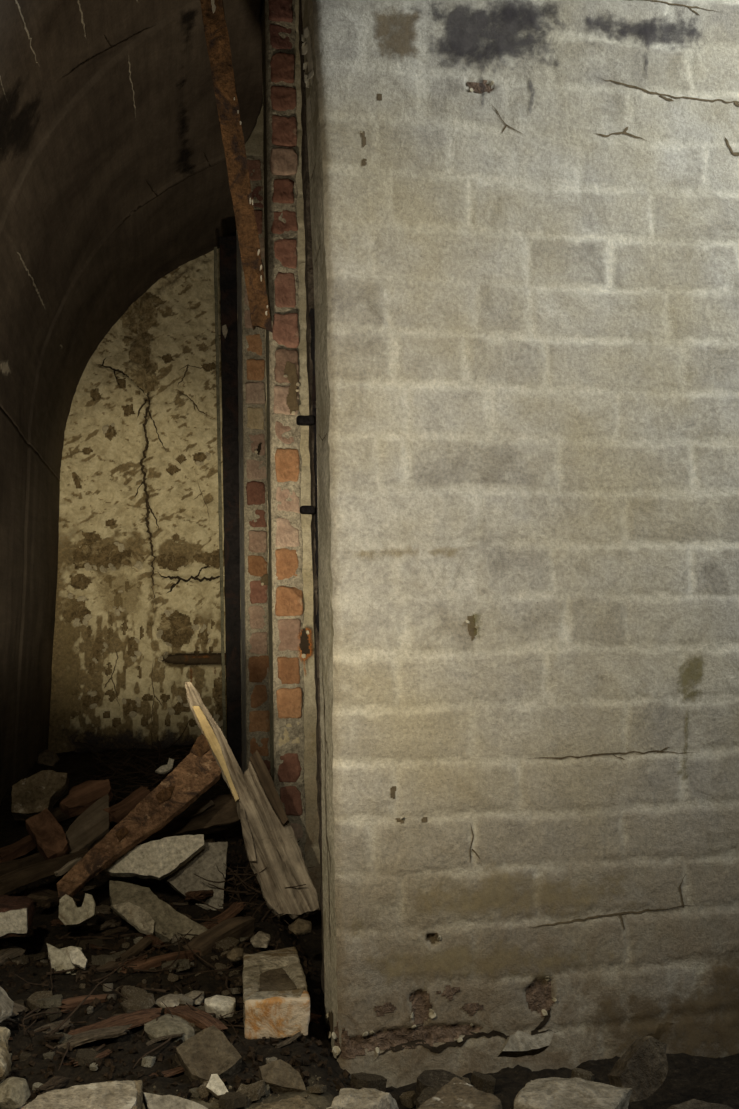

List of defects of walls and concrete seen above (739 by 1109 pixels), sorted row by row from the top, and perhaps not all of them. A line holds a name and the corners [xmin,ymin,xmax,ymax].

leakage [377,13,418,55]
leakage [434,0,559,95]
leakage [587,17,700,46]
crack [599,77,739,107]
crack [593,127,649,142]
spalling [102,404,136,441]
spalling [166,452,211,476]
crack [94,358,220,616]
spalling [61,518,224,679]
spalling [67,688,197,728]
crack [528,747,695,760]
spalling [325,985,483,1059]